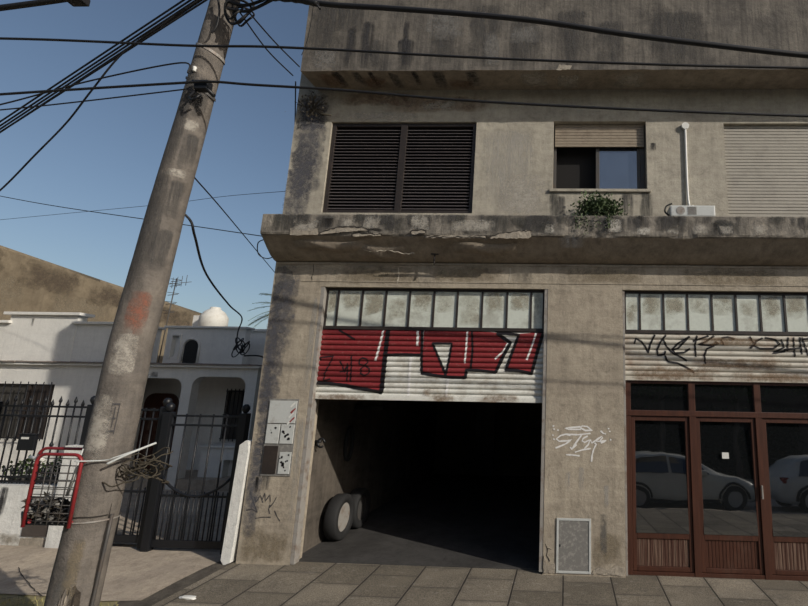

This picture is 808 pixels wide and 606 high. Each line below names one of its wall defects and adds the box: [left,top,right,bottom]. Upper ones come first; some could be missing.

leakage [398,22,414,65]
leakage [276,96,334,229]
leakage [448,132,577,233]
spalling [290,226,381,237]
leakage [344,214,430,231]
spalling [411,230,531,239]
leakage [592,193,686,235]
leakage [694,216,741,233]
leakage [244,274,298,560]